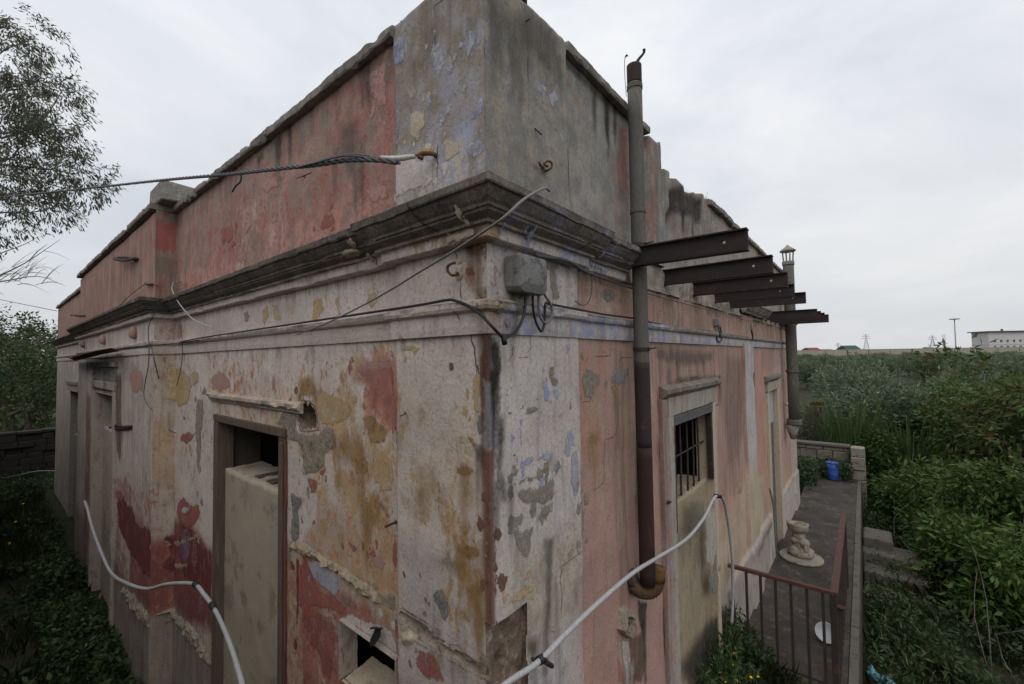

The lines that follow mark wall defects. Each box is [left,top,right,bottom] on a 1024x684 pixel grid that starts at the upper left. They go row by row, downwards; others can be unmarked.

peeling [358,20,481,217]
water stain [668,186,701,221]
peeling [130,363,236,473]
water stain [479,340,504,465]
peeling [116,491,211,603]
flaking render [278,362,589,684]